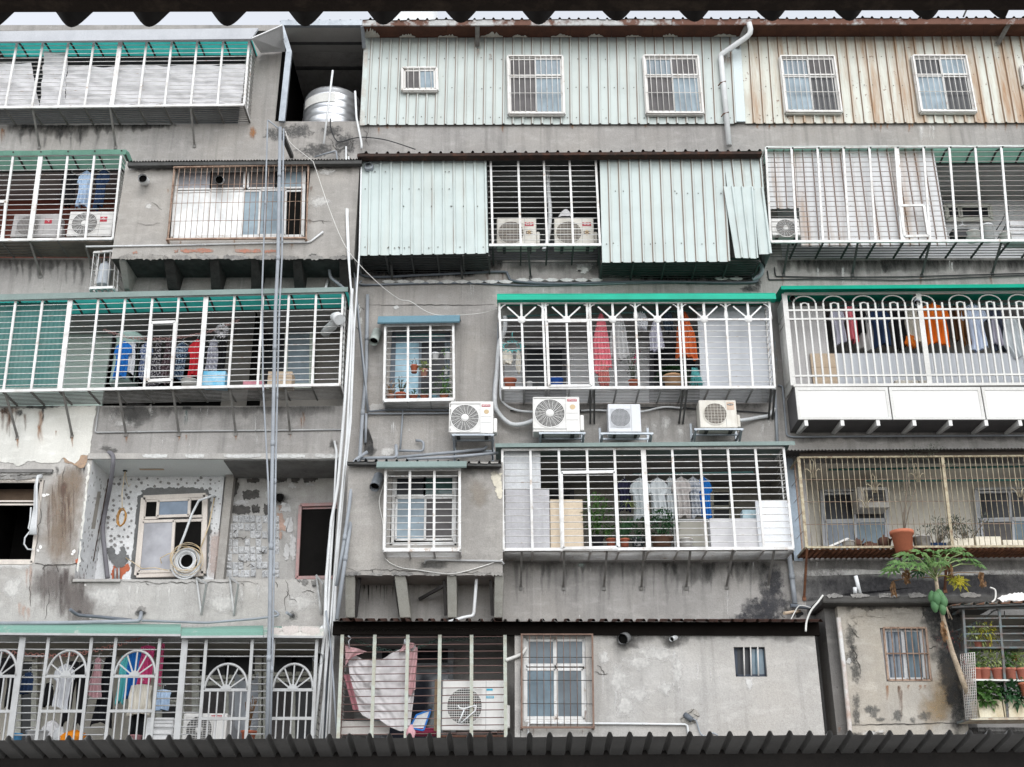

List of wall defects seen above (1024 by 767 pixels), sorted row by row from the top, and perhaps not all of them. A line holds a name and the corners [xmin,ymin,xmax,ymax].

leakage [48,466,85,556]
peeling [0,405,318,586]
leakage [35,571,143,618]
leakage [209,586,243,611]
leakage [522,561,790,619]
leakage [797,560,1024,735]